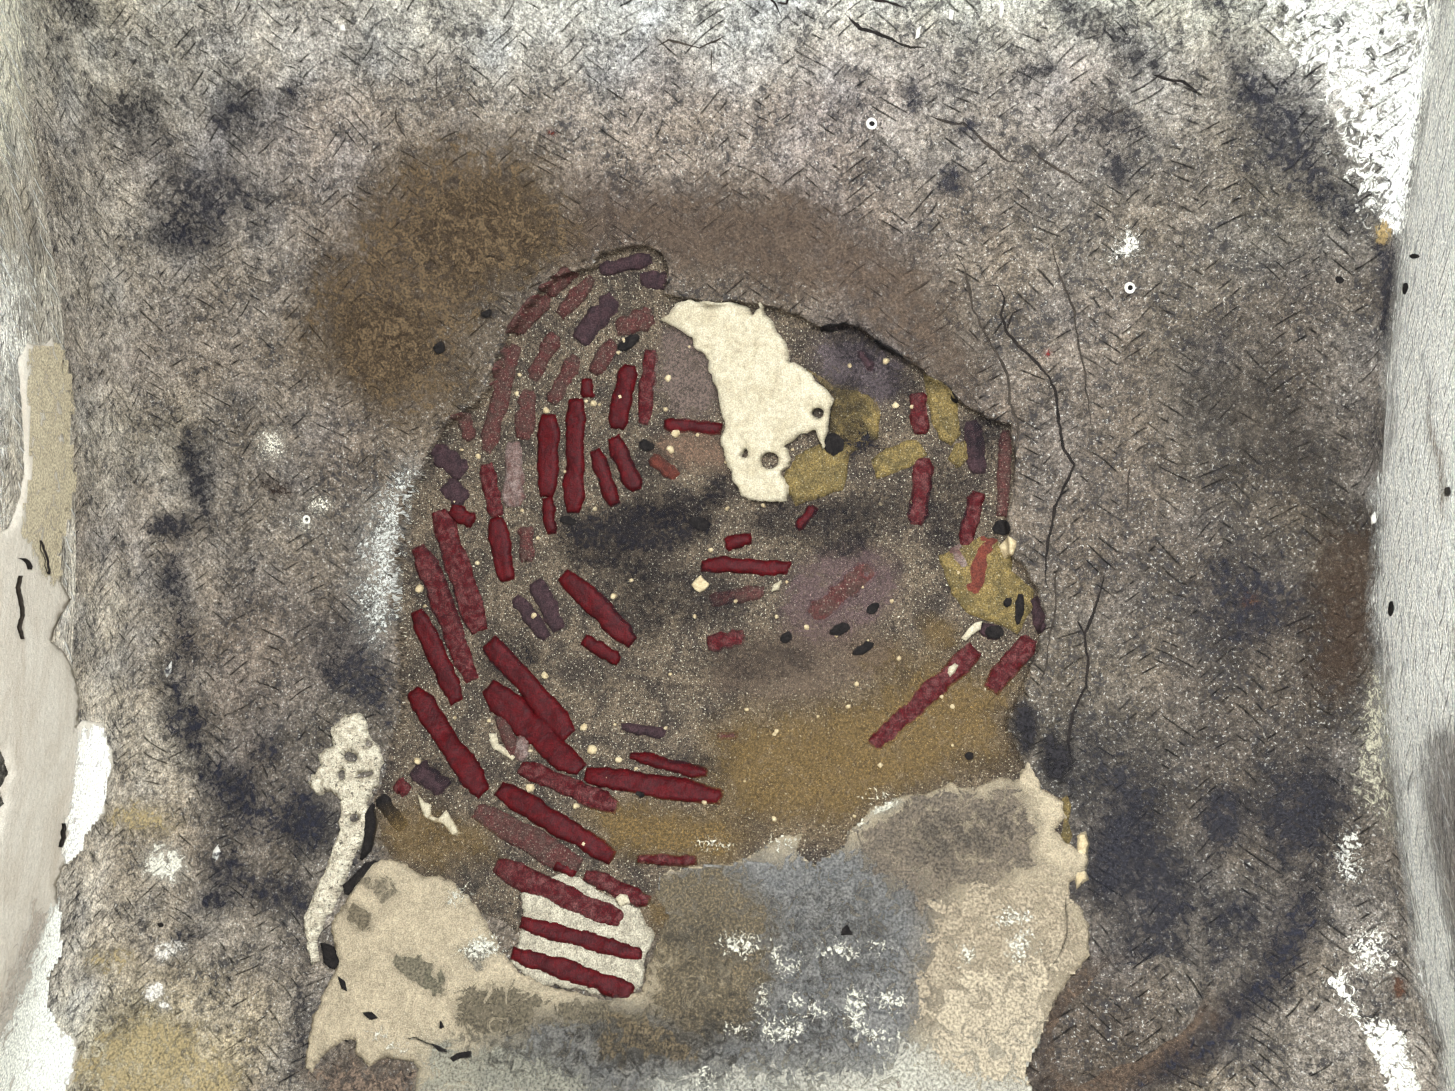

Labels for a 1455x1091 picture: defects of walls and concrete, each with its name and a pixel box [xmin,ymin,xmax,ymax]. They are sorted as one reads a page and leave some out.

crack [770,0,789,18]
crack [844,0,923,49]
crack [1100,107,1127,115]
crack [1153,75,1197,91]
water stain [292,126,985,426]
crack [952,240,1108,780]
peeling [1229,0,1455,1091]
spalling [374,245,1046,998]
spalling [0,751,8,807]
spalling [431,1021,472,1062]